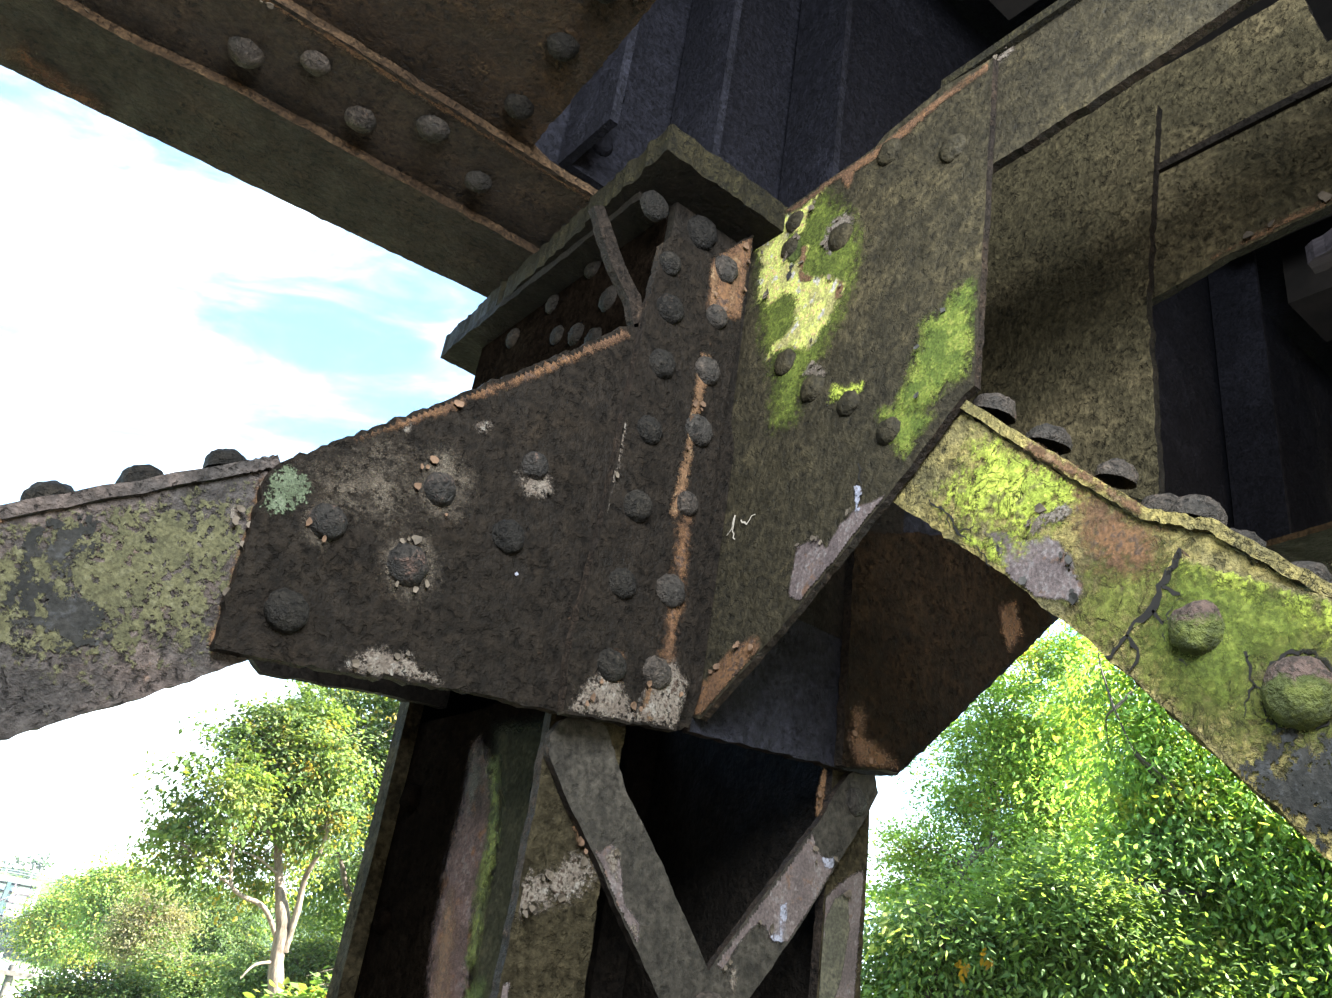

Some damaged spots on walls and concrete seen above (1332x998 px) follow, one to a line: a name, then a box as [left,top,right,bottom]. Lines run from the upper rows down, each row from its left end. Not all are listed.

corrosion [709,239,751,317]
corrosion [670,375,708,578]
peeling [789,485,885,600]
corrosion [571,605,760,729]
crack [1104,548,1188,671]